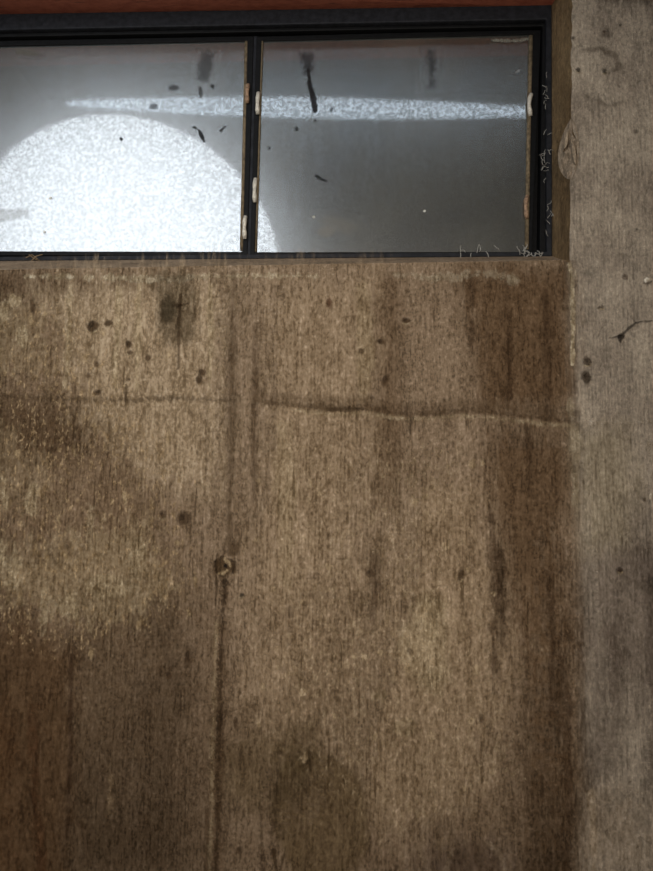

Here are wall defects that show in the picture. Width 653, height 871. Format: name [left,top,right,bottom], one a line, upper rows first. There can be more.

water stain [0,260,582,871]
crack [615,320,652,342]